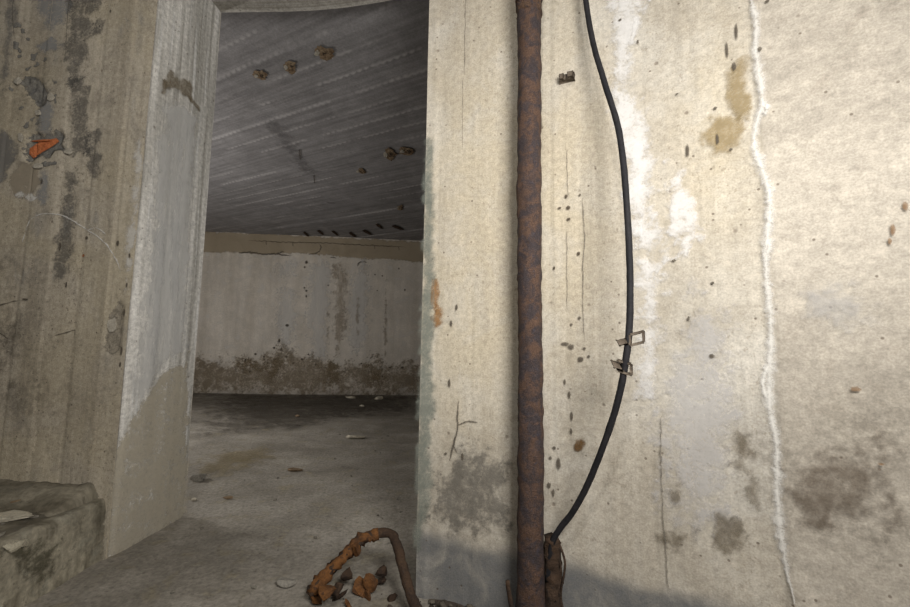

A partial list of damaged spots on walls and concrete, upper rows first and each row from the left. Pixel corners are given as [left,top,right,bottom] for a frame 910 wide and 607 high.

spalling [9,22,73,184]
leakage [607,0,702,255]
leakage [103,70,512,560]
spalling [303,224,404,237]
leakage [634,257,669,398]
crack [750,0,795,604]
rust [307,528,379,597]